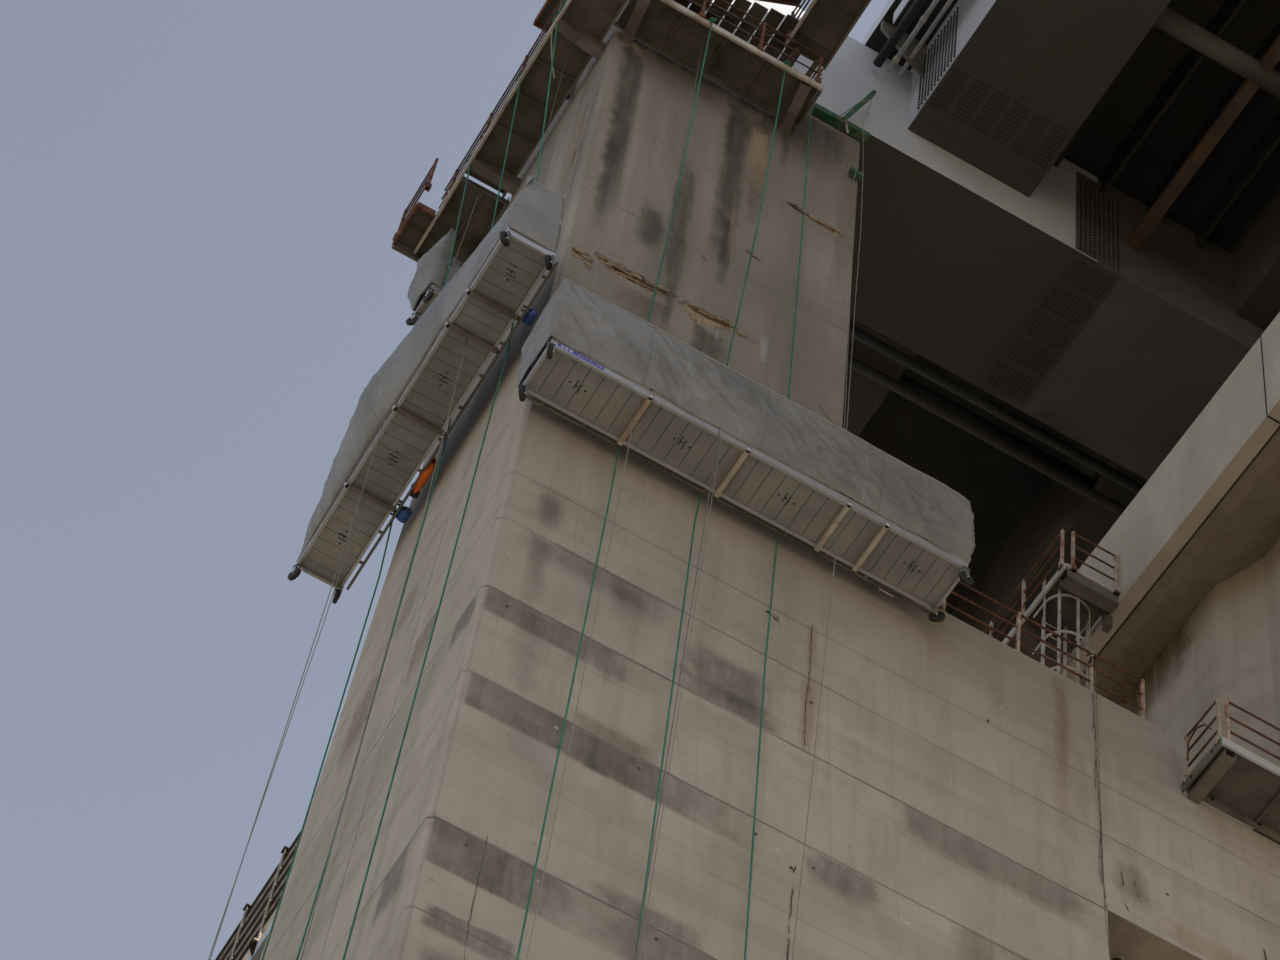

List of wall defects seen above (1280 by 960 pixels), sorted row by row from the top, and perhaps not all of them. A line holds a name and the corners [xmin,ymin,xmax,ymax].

leakage [606,37,838,265]
spalling [789,202,843,236]
spalling [571,246,751,342]